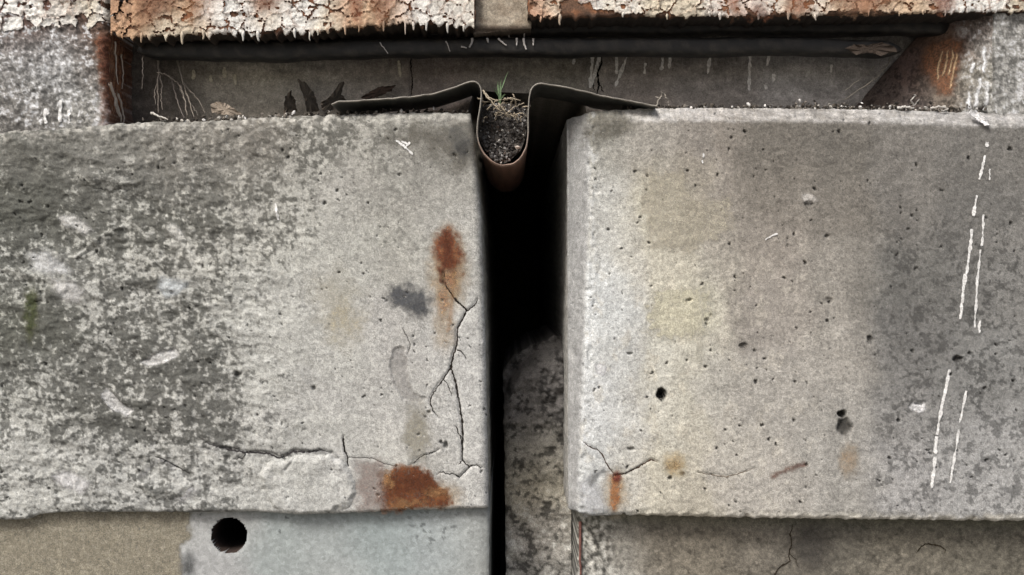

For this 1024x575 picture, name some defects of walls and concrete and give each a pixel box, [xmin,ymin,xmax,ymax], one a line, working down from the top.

peeling [0,0,474,44]
peeling [529,0,563,25]
peeling [578,0,1024,21]
rust [94,32,128,118]
rust [921,35,963,95]
rust [433,226,465,315]
crack [208,273,481,478]
crack [585,443,655,475]
rust [356,463,453,513]
rust [610,472,622,511]